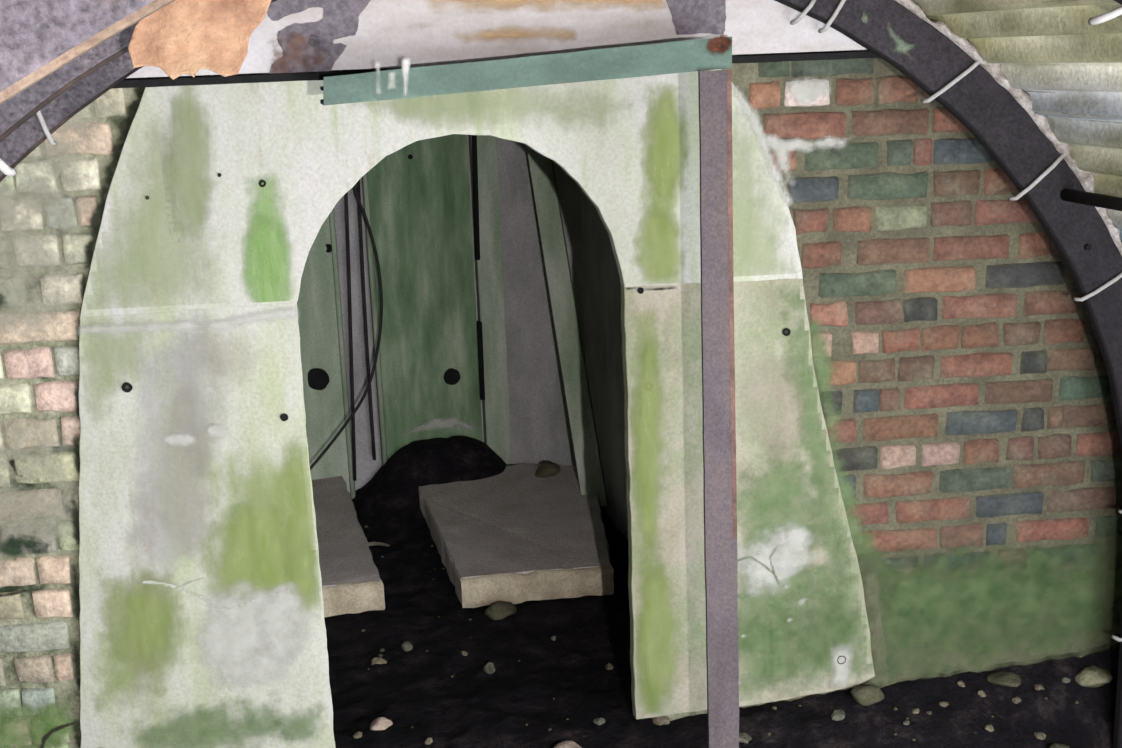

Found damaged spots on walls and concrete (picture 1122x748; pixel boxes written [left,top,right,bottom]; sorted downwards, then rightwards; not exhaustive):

peeling [267,0,370,74]
damp [895,0,1118,193]
damp [651,102,683,193]
damp [81,221,296,333]
damp [638,213,677,278]
damp [1095,207,1122,256]
damp [200,478,315,684]
damp [834,650,850,686]
hole [40,723,74,748]
damp [286,718,312,738]